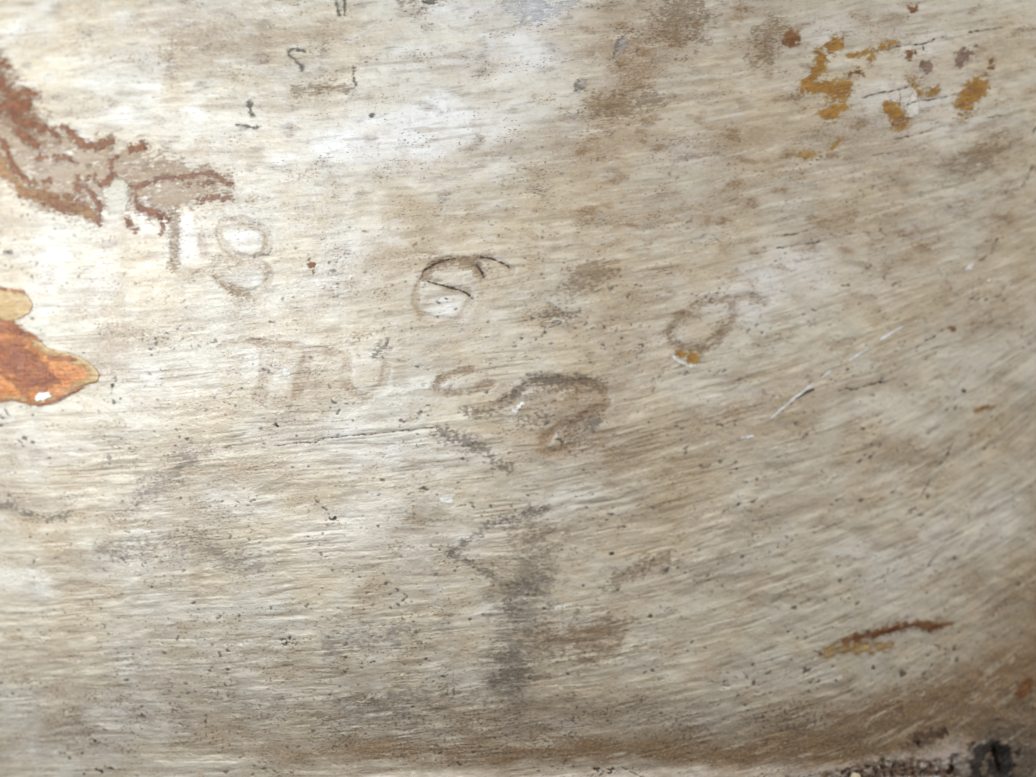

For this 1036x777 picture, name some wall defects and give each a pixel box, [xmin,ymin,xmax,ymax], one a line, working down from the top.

corrosion [782,27,801,48]
corrosion [0,58,149,227]
corrosion [795,137,845,160]
corrosion [795,34,941,123]
corrosion [881,99,912,132]
corrosion [951,44,995,124]
corrosion [124,170,234,237]
corrosion [0,287,99,406]
corrosion [823,617,953,658]